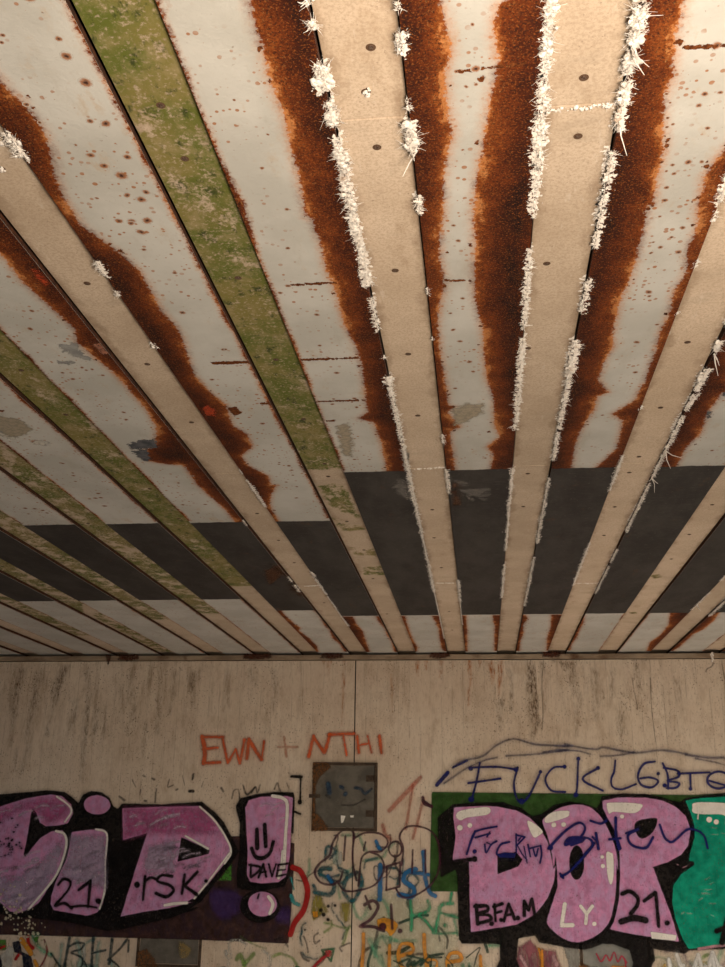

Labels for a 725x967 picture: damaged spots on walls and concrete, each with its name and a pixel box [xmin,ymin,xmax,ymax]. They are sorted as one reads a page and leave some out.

rust [0,0,329,524]
rust [155,0,407,472]
leakage [310,58,382,333]
leakage [393,0,412,60]
leakage [395,96,426,177]
leakage [380,372,463,639]
rust [398,0,550,470]
leakage [507,245,536,431]
leakage [550,335,584,461]
leakage [526,0,662,250]
rust [552,0,725,469]
leakage [624,337,725,533]